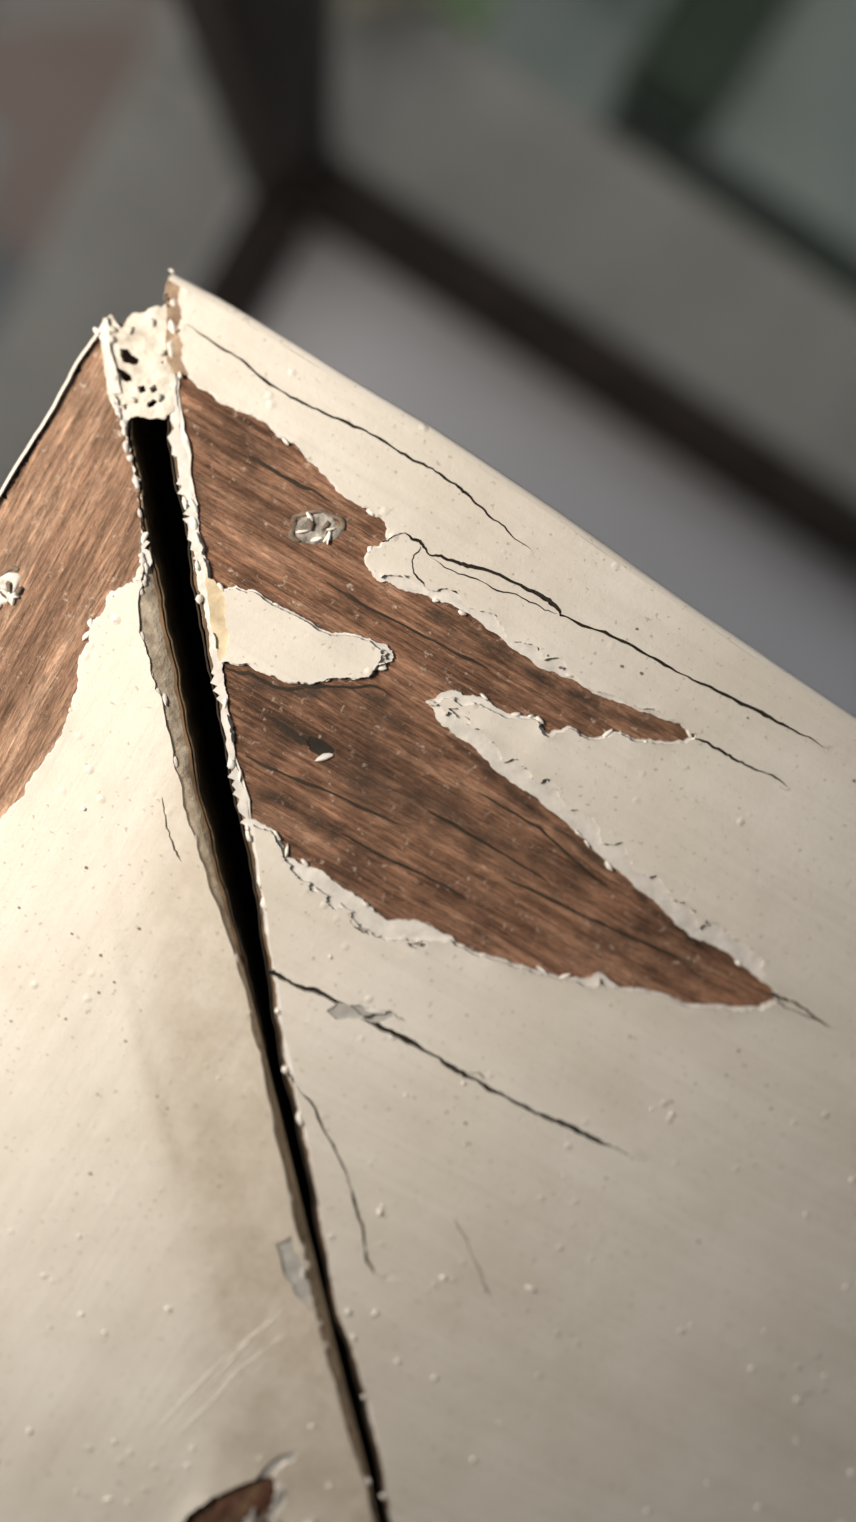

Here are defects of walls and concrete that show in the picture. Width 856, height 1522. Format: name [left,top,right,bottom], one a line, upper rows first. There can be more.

crack [188,325,529,548]
peeling [0,327,153,821]
peeling [163,269,777,1011]
crack [382,532,823,747]
crack [692,735,788,787]
peeling [327,1003,395,1023]
crack [126,388,617,1522]
peeling [183,1452,298,1522]